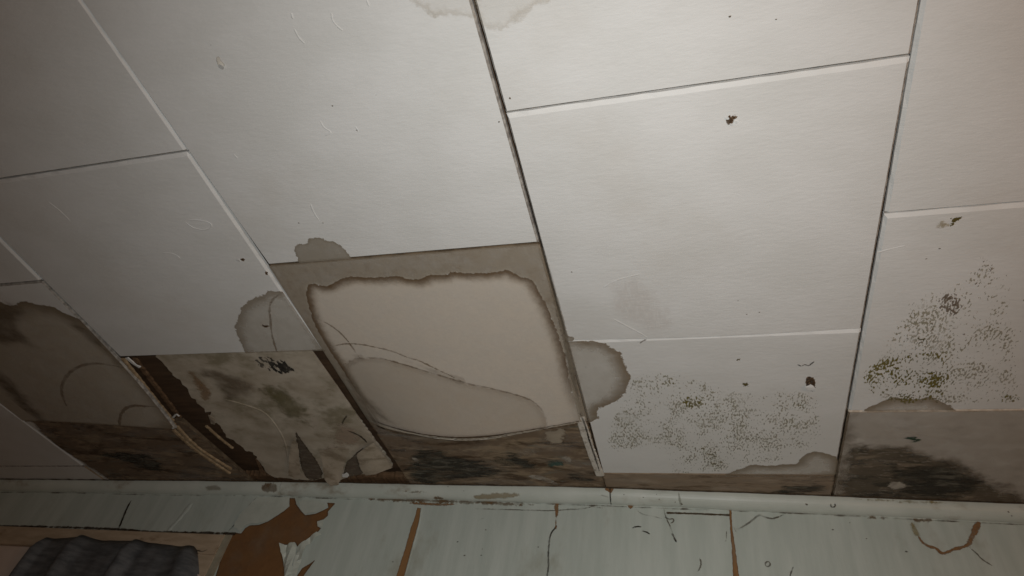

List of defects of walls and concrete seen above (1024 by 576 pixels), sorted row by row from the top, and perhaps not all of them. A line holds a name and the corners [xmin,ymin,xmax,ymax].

damp [0,301,250,481]
damp [235,238,1024,503]
peeling [216,497,335,576]
corrosion [911,519,991,565]